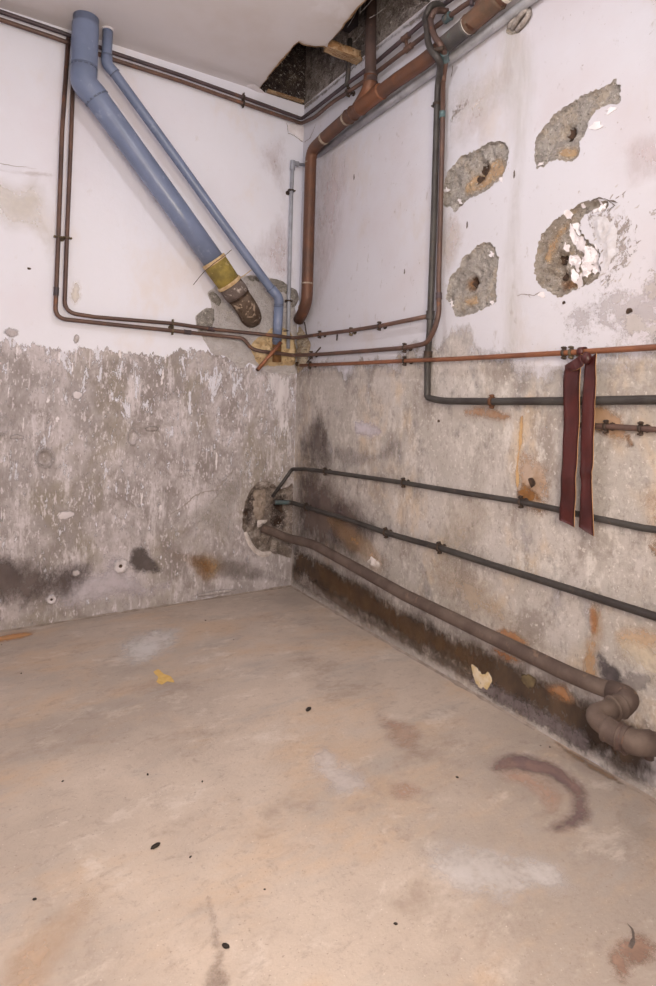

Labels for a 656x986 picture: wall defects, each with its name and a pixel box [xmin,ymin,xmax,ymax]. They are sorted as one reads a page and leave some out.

spalling [246,0,366,93]
spalling [534,78,621,169]
spalling [443,141,509,212]
spalling [446,242,499,317]
spalling [534,185,641,298]
leakage [300,475,373,553]
leakage [0,548,160,602]
peeling [0,330,656,799]
leakage [293,550,656,784]